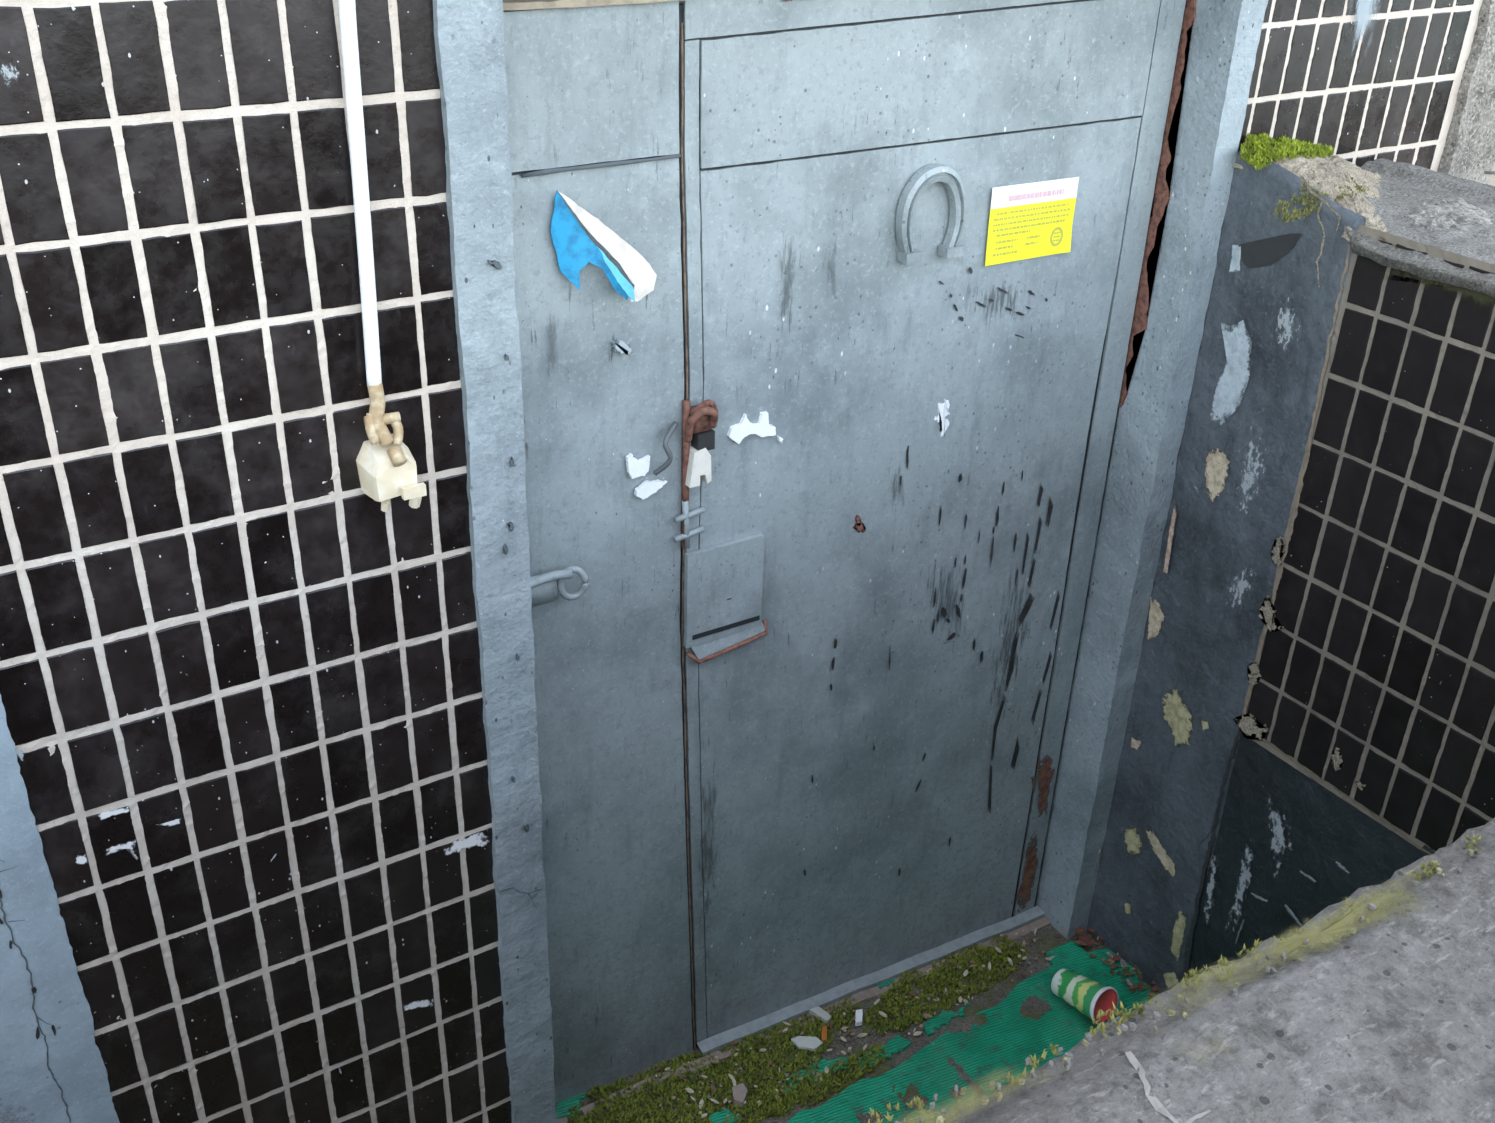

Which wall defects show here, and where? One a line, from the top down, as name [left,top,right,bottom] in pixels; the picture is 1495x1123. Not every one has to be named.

rust [1118,0,1196,408]
peeling [1210,320,1252,426]
spalling [1205,447,1230,503]
peeling [1162,500,1177,576]
spalling [1147,596,1165,641]
spalling [1162,686,1209,747]
spalling [1233,713,1268,740]
rust [681,549,696,1051]
rust [1015,753,1055,913]
spalling [1124,827,1176,878]
spalling [1162,910,1187,989]
crack [0,860,71,1123]